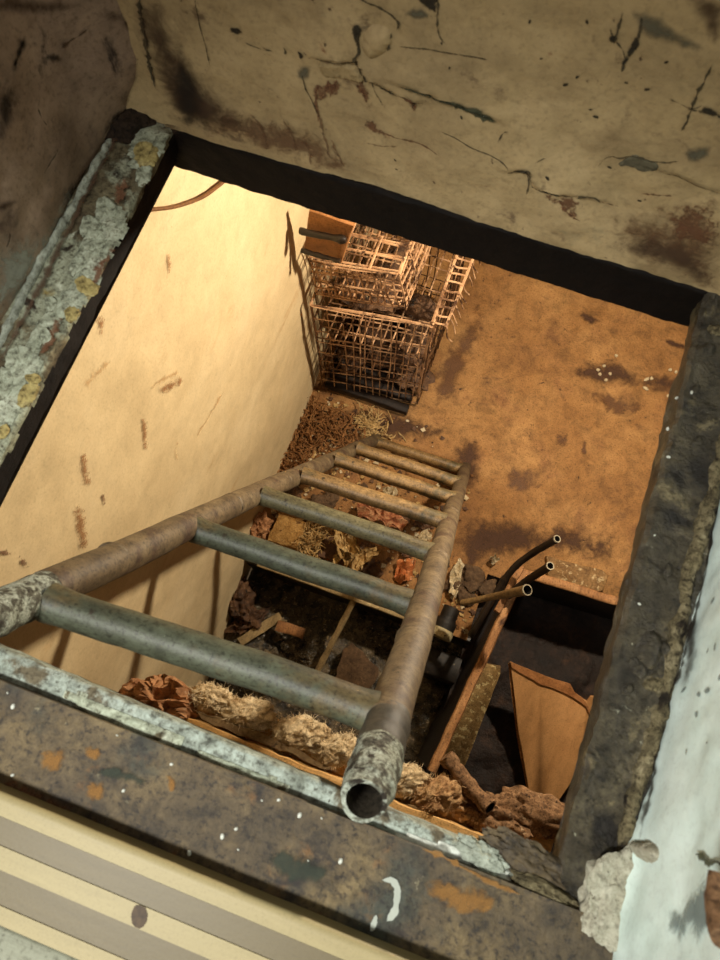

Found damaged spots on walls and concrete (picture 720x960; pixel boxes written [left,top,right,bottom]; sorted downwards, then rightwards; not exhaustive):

crack [137,0,155,87]
crack [362,0,485,60]
crack [614,13,642,58]
water stain [146,17,344,168]
crack [302,31,600,202]
crack [670,67,711,130]
peeling [127,122,170,187]
crack [599,156,717,193]
corrosion [626,206,718,277]
peeling [0,195,129,439]
corrosion [74,508,88,548]